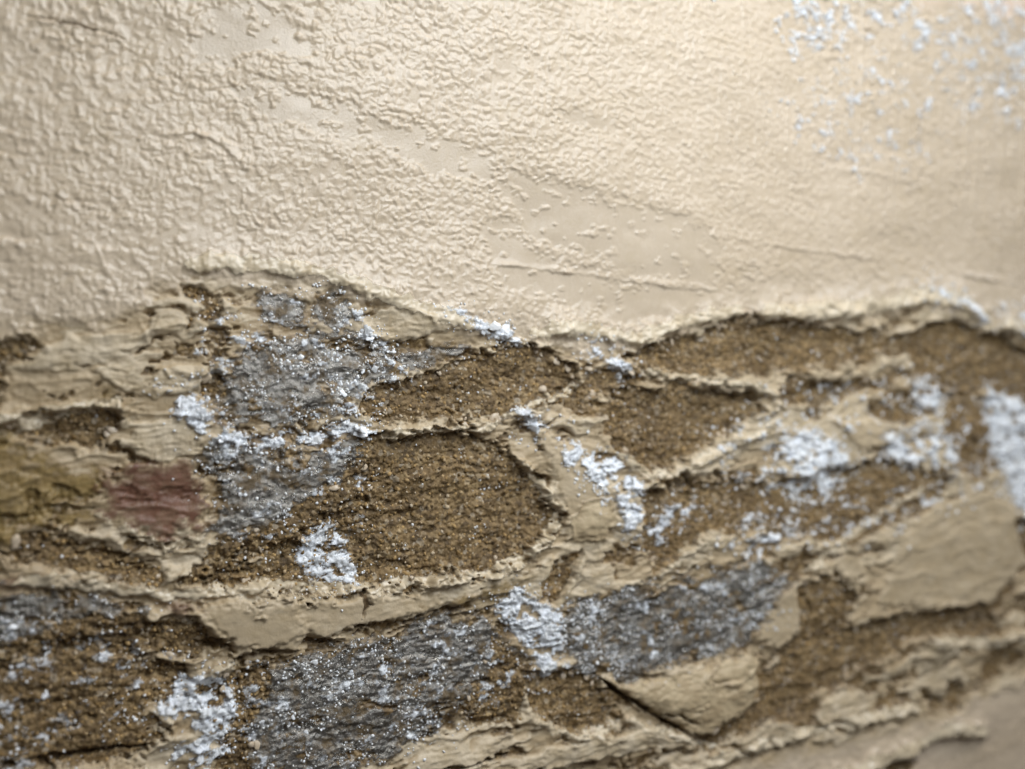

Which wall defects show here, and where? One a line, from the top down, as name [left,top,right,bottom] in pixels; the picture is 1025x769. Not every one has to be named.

water stain [759,0,1025,183]
water stain [433,300,532,364]
water stain [572,324,643,394]
water stain [0,434,101,544]
water stain [143,277,471,612]
spalling [0,250,1025,769]
water stain [100,364,1025,769]
water stain [0,586,124,683]
water stain [0,690,79,769]